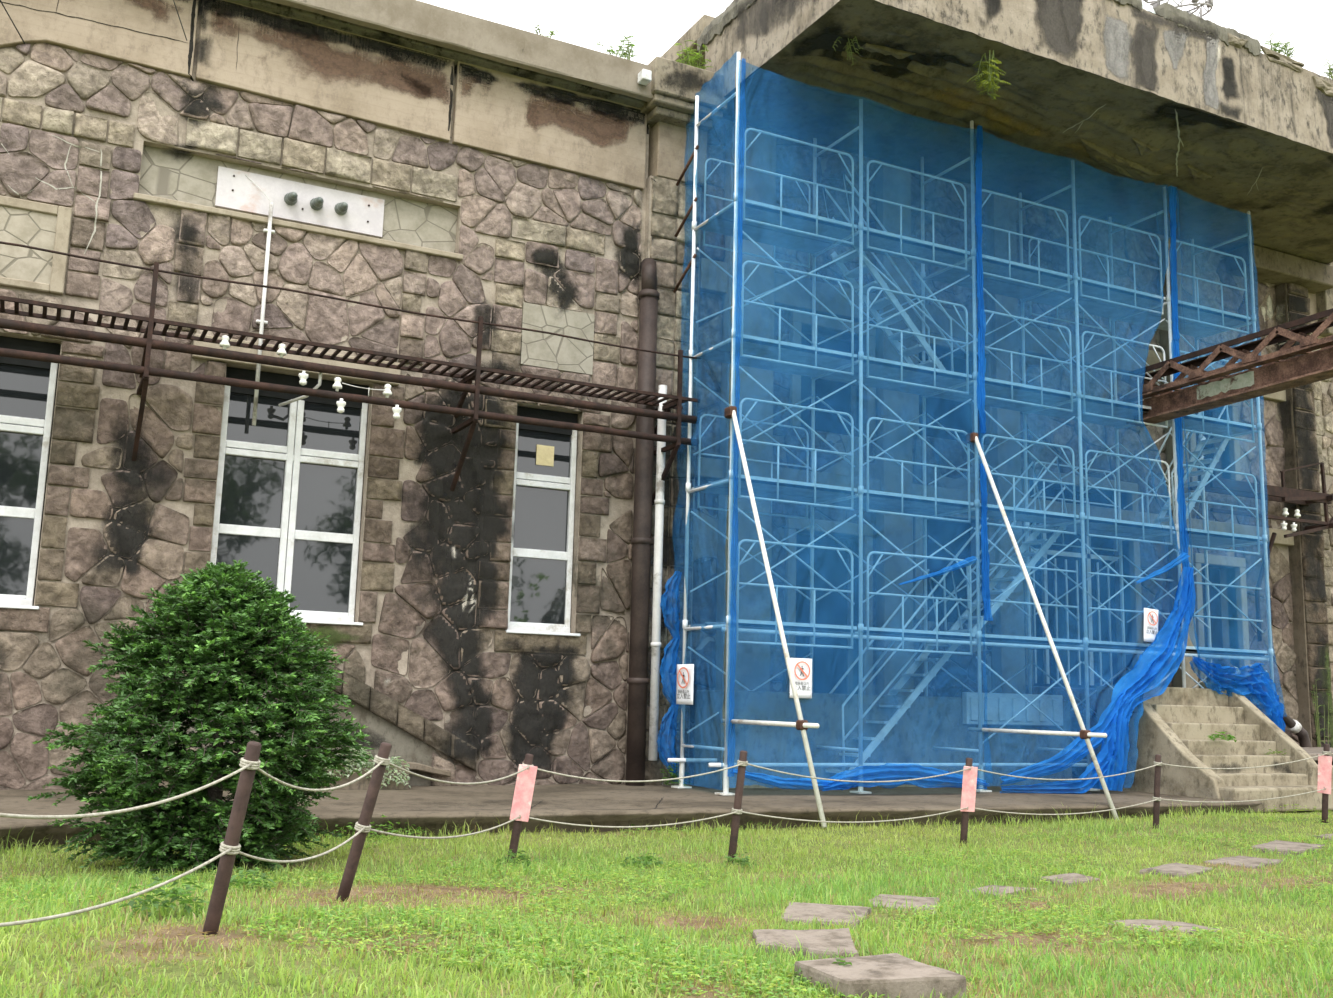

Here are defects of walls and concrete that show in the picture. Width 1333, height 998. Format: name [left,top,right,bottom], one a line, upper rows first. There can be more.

leakage [197,0,209,61]
leakage [981,0,1001,22]
leakage [1036,0,1082,58]
leakage [1106,7,1245,128]
leakage [1317,90,1333,161]
leakage [533,249,575,309]
leakage [473,302,496,347]
leakage [407,380,513,760]
leakage [508,643,578,770]